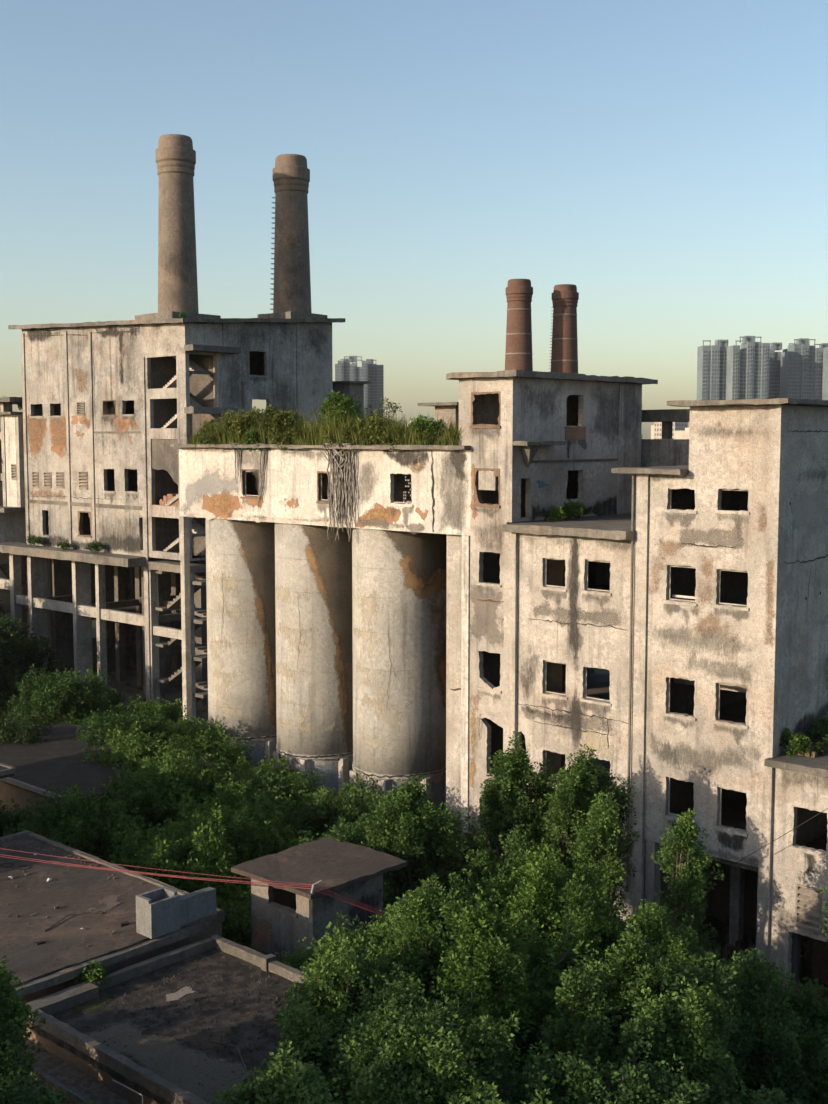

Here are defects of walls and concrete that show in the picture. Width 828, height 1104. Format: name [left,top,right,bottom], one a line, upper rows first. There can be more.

flaking render [27,415,90,459]
flaking render [187,490,428,534]
corrosion [239,545,275,724]
corrosion [305,544,348,741]
corrosion [400,555,447,707]
leakage [563,537,579,668]
leakage [570,696,581,746]